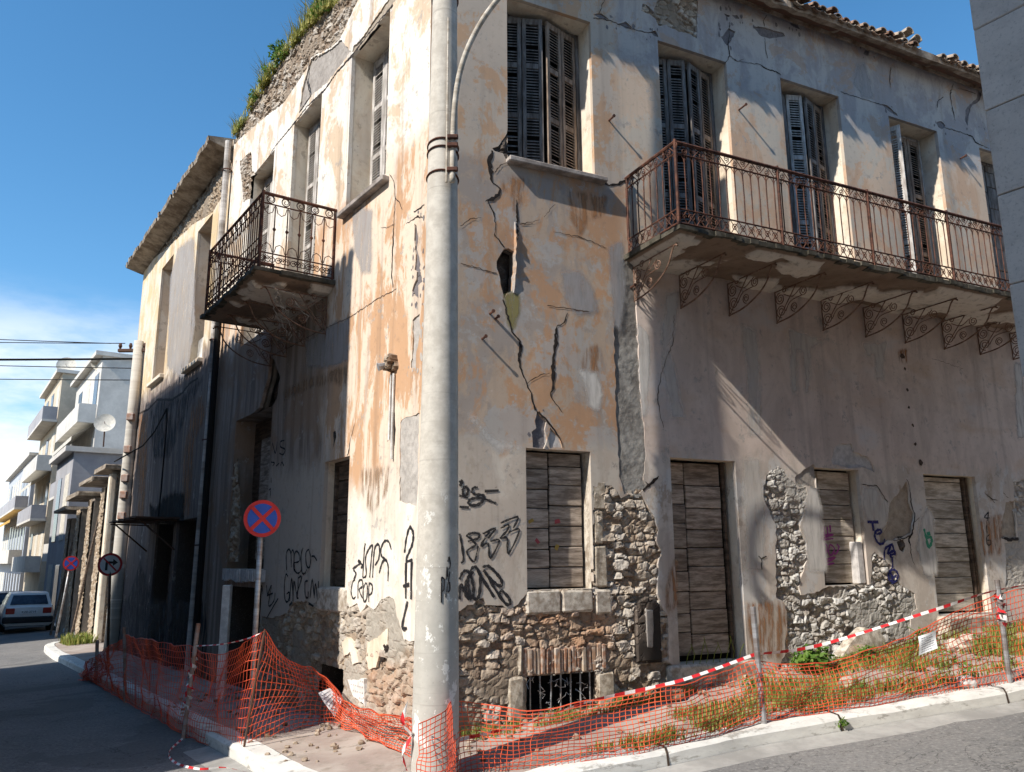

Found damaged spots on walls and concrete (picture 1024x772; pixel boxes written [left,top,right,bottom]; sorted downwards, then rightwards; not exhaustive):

flaking render [301,0,396,108]
crack [725,15,781,75]
damp [353,208,372,271]
crack [460,150,605,248]
crack [503,299,589,448]
peeling [614,259,646,498]
crack [657,319,675,428]
flaking render [795,465,815,488]
flaking render [879,484,913,552]
flaking render [342,628,389,706]